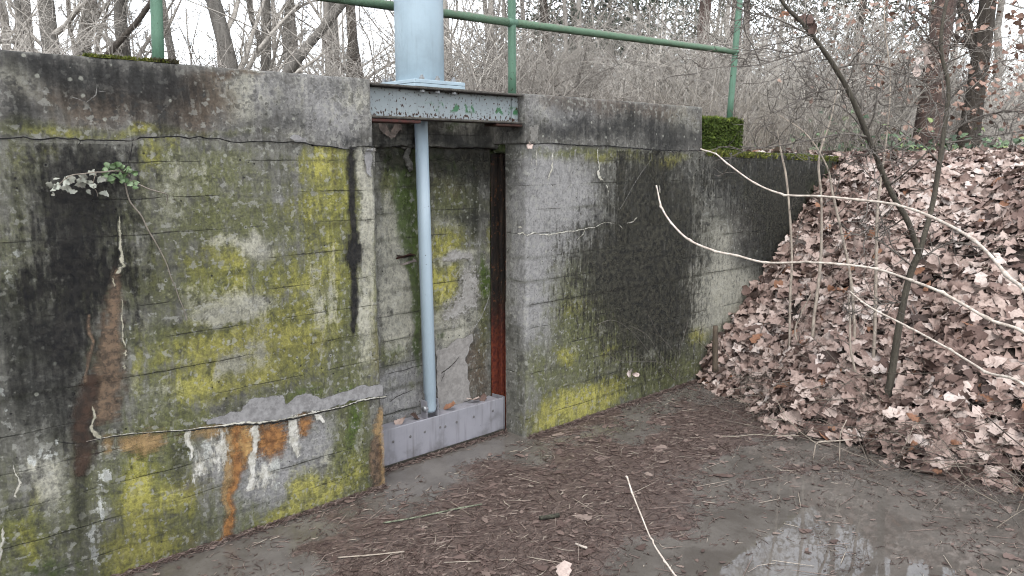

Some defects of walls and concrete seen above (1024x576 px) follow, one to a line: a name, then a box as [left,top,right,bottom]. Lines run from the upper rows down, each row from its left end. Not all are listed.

crack [0,90,403,163]
crack [518,143,702,239]
damp [7,143,140,454]
crack [112,216,126,287]
damp [345,147,363,333]
damp [552,148,831,397]
corrosion [72,269,166,476]
corrosion [192,416,312,541]
crack [61,357,459,444]
damp [246,423,274,492]
peeling [204,384,383,425]
corrosion [369,409,385,488]